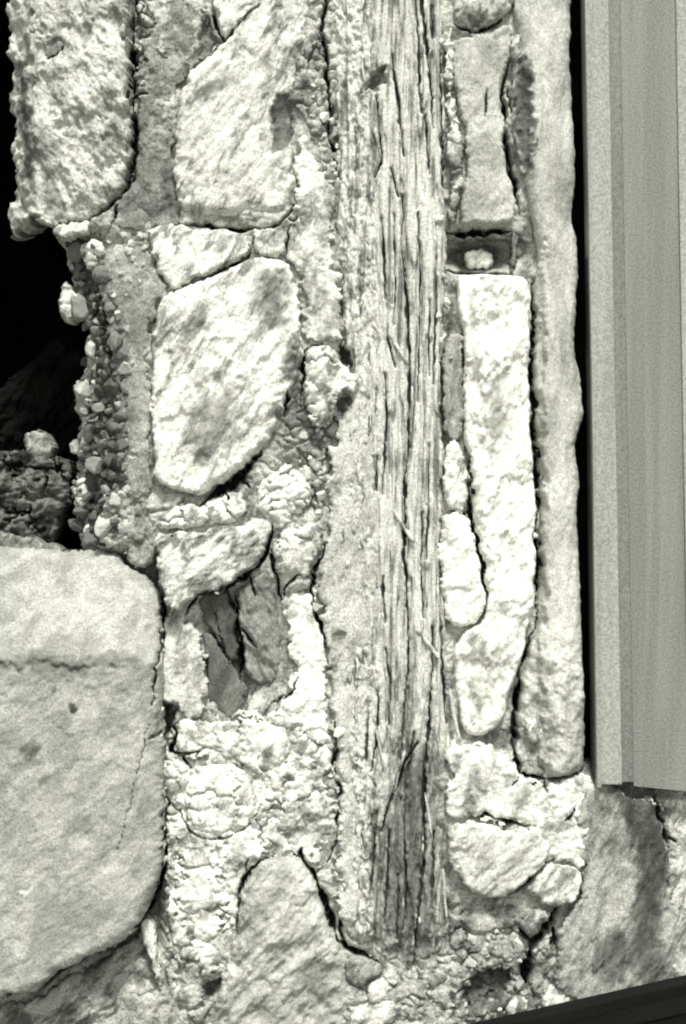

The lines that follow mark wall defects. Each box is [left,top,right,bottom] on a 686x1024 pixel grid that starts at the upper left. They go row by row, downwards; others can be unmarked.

crack [200,452,262,507]
crack [116,529,327,850]
crack [294,723,372,958]
crack [473,811,530,826]